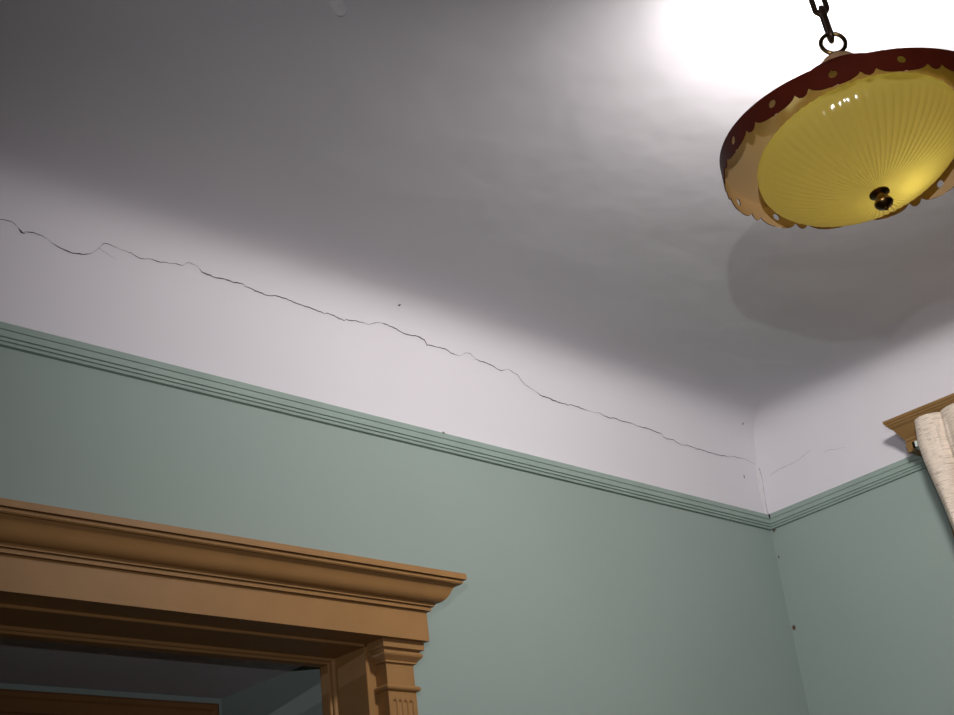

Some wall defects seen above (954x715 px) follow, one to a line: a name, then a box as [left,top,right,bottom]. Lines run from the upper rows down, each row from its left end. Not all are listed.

crack [0,219,844,513]